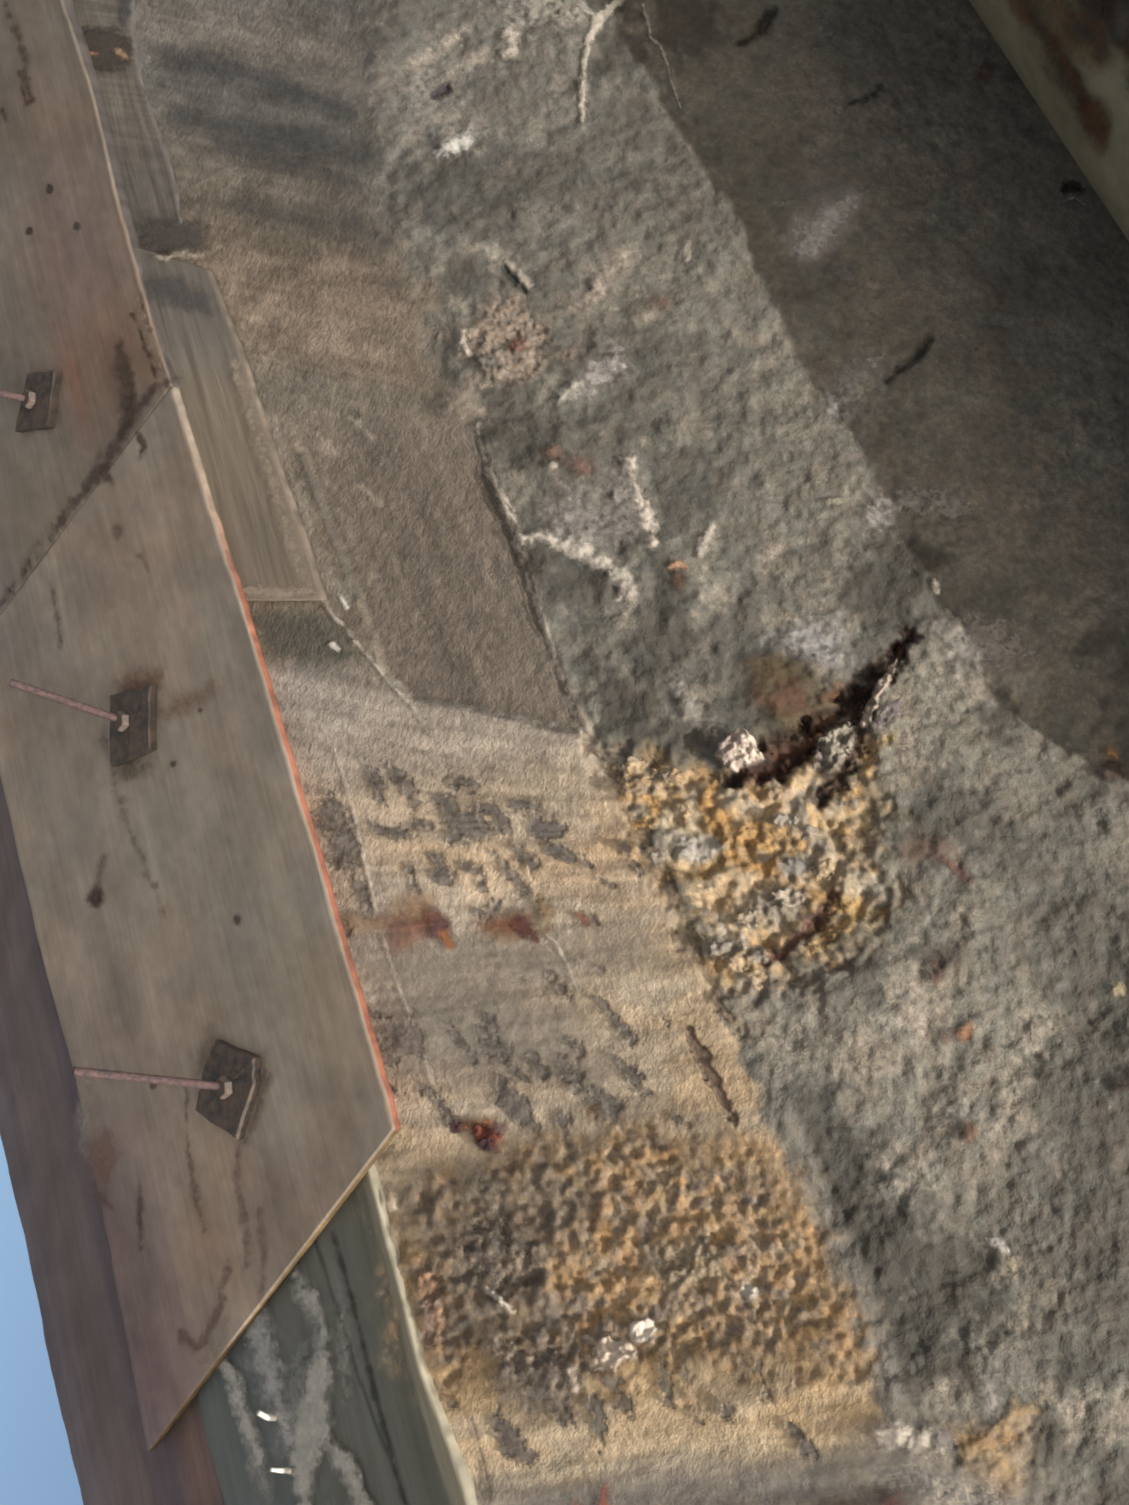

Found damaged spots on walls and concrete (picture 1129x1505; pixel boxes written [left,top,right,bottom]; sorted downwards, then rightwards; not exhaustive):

crack [578,0,682,121]
rust [1070,0,1129,59]
peeling [310,756,617,924]
crack [322,415,738,1126]
spalling [589,628,915,1003]
efflorescence [218,1271,373,1505]
water stain [982,1376,1001,1421]